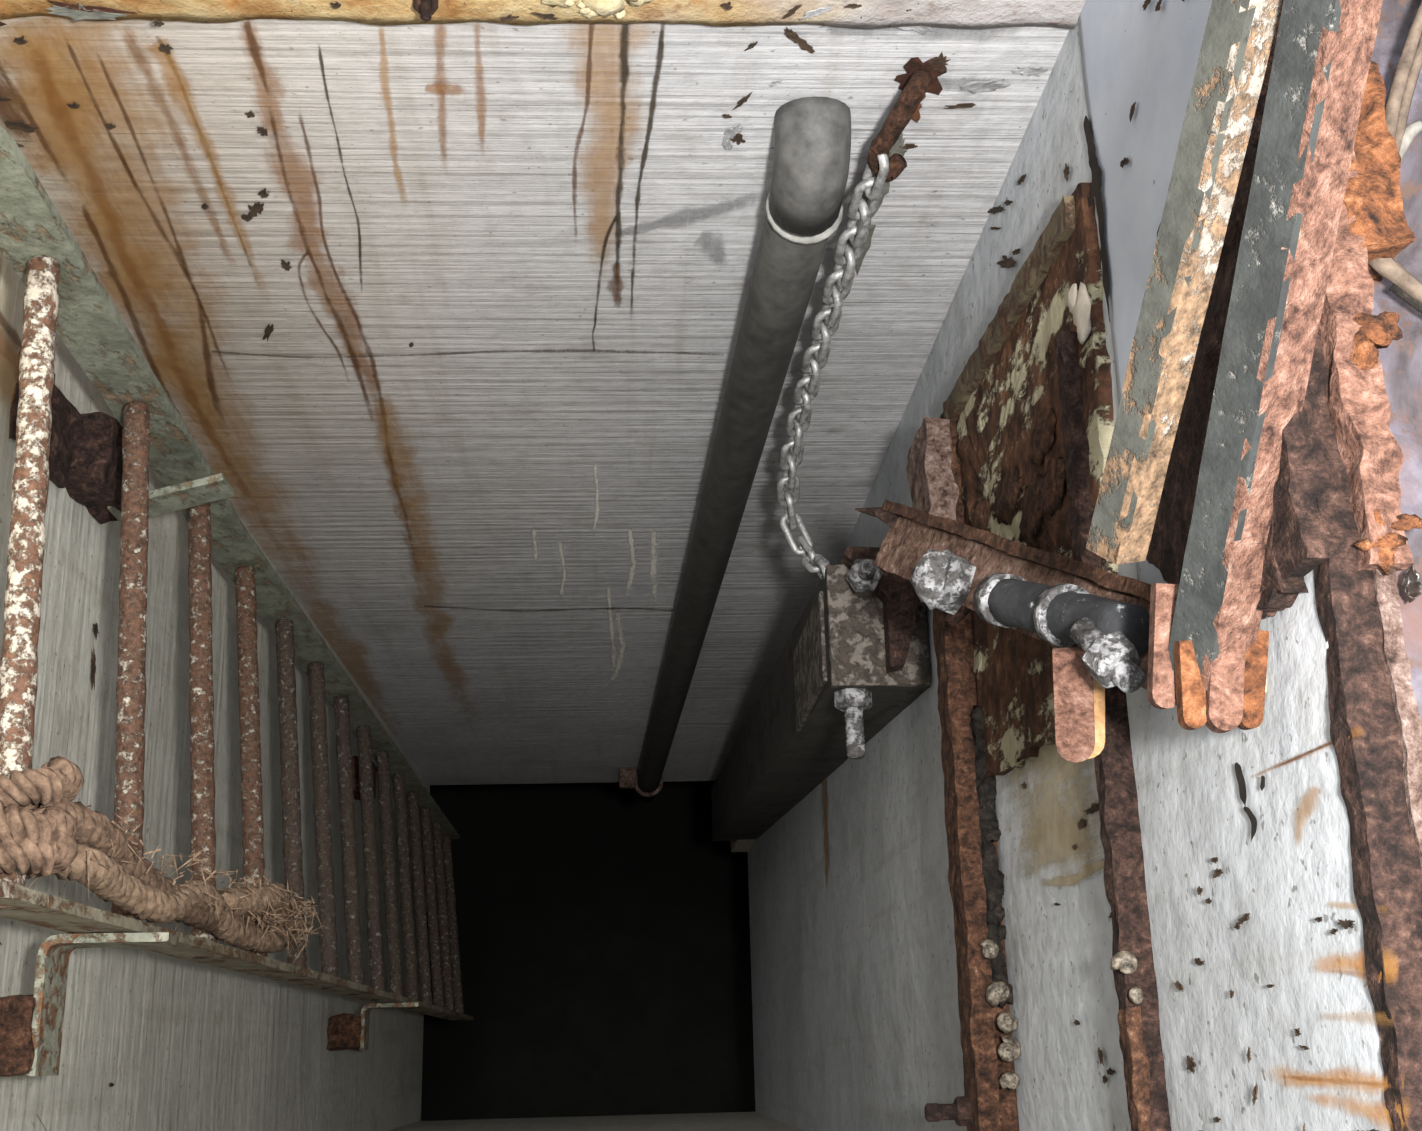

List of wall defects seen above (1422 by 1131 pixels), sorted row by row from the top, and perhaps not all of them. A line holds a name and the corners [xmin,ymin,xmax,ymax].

rust [245,23,267,88]
rust [89,64,189,277]
rust [319,49,362,283]
damp [542,0,743,324]
peeling [987,173,1027,230]
peeling [997,248,1021,269]
rust [84,210,170,399]
rust [298,120,407,517]
crack [212,320,714,358]
rust [1282,742,1332,765]
rust [1325,955,1397,979]
rust [1287,1073,1388,1089]